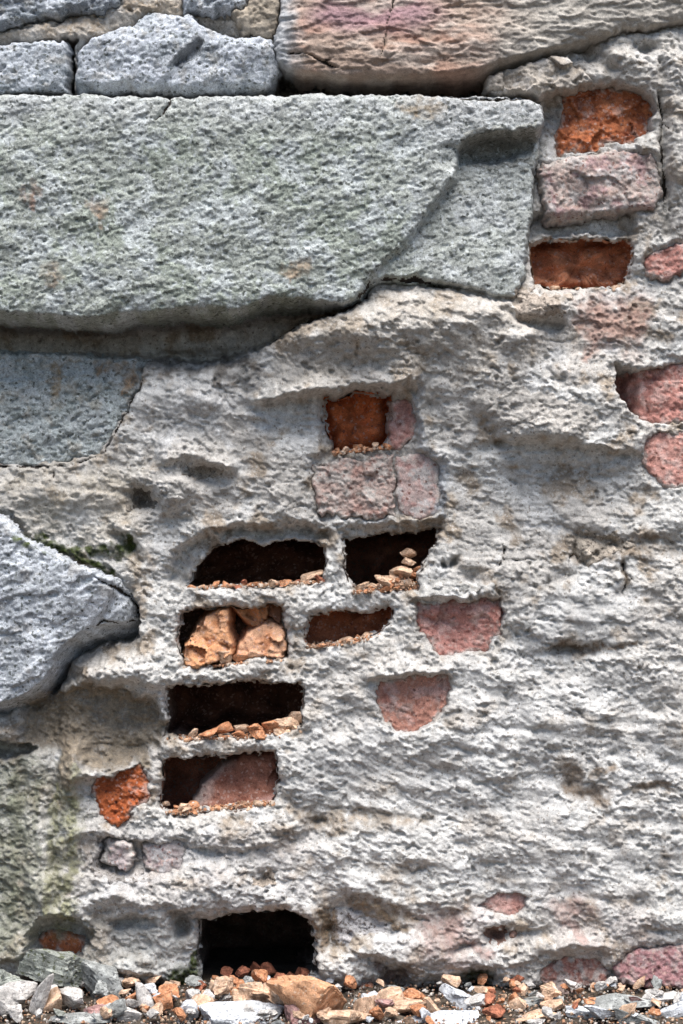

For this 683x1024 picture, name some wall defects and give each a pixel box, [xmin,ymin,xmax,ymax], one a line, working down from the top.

spalling [321,390,392,453]
spalling [125,488,158,512]
spalling [181,465,223,481]
hole [185,539,328,589]
spalling [342,528,440,593]
spalling [176,604,288,670]
hole [304,607,393,645]
spalling [160,680,305,817]
leakage [49,743,77,847]
hole [197,909,318,976]